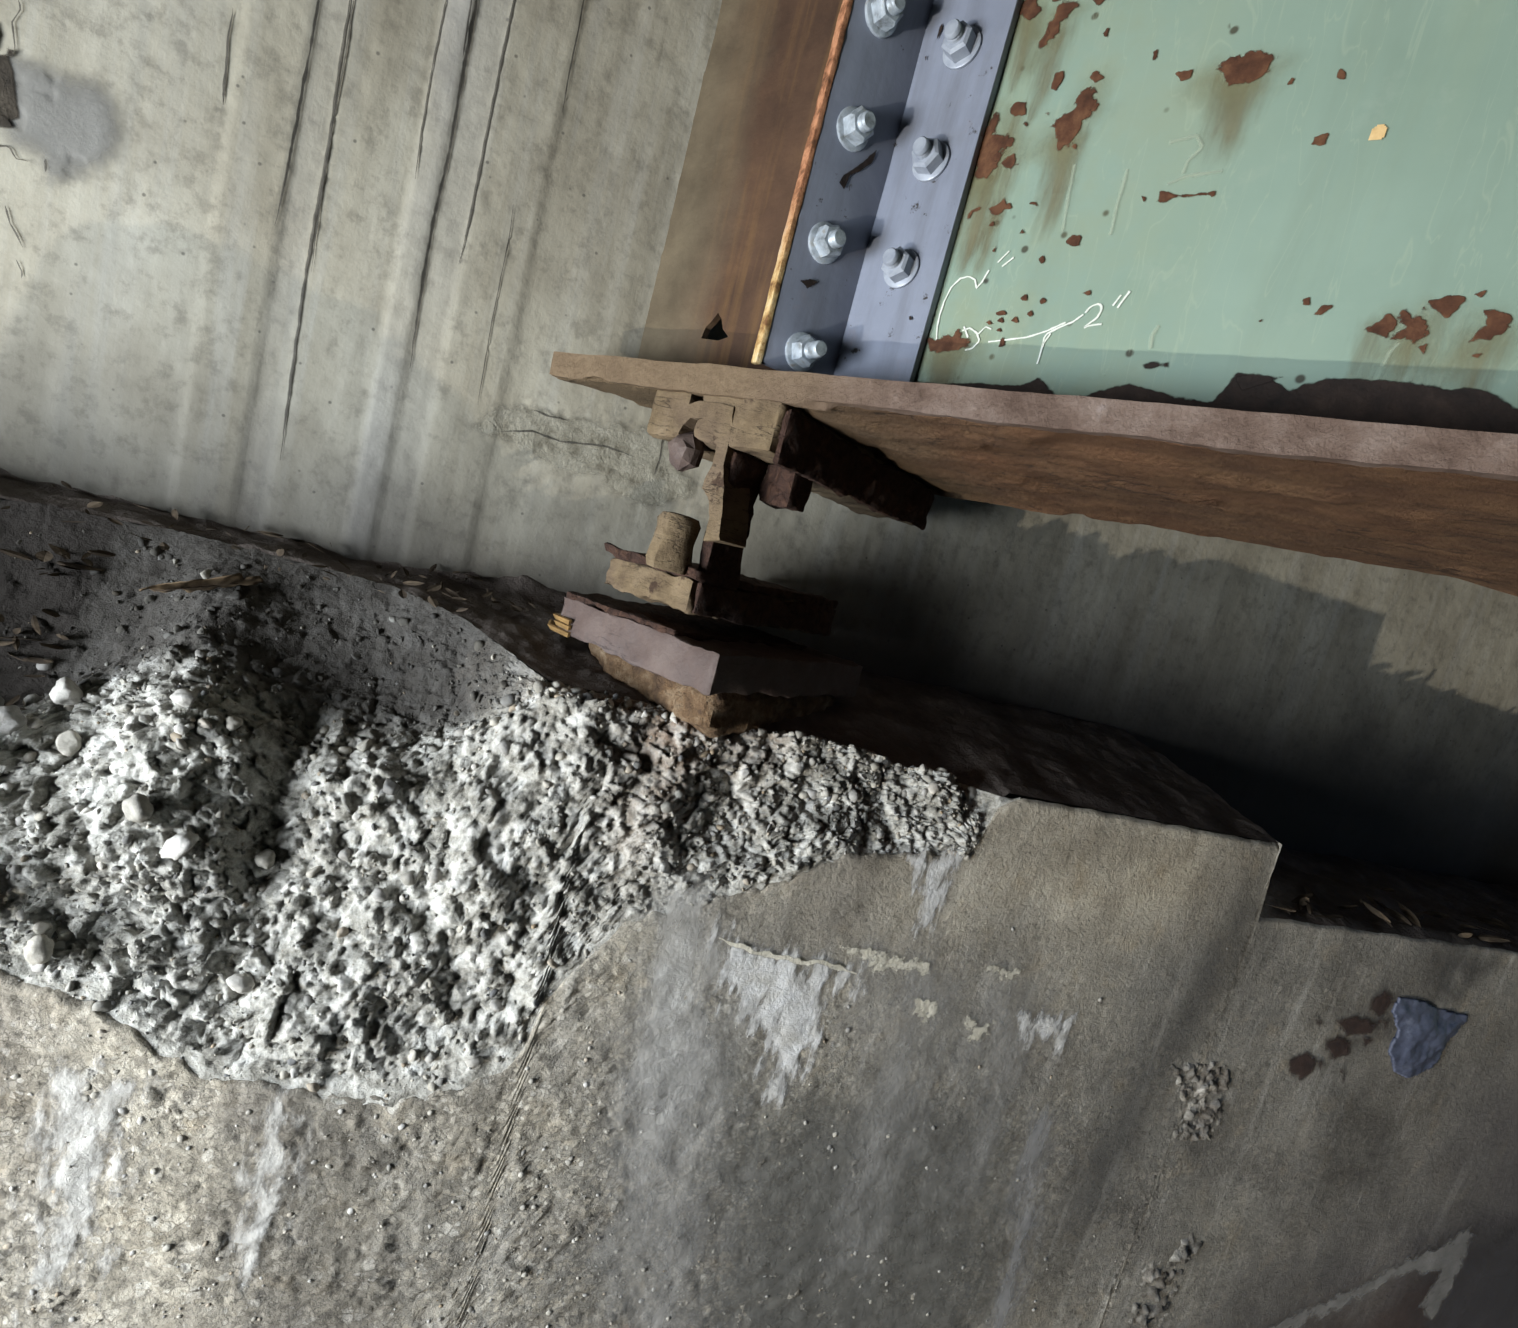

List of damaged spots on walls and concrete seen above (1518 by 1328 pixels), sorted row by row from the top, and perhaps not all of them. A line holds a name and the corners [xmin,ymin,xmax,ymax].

crack [11,0,21,50]
rust [1019,0,1104,65]
rust [1216,50,1274,140]
crack [0,145,47,172]
rust [966,71,1104,256]
rust [1142,191,1216,203]
crack [5,206,23,278]
rust [914,329,1055,395]
spalling [0,500,1020,1107]
rust [1289,991,1393,1082]
spalling [1170,1061,1229,1142]
spalling [1128,1231,1203,1328]